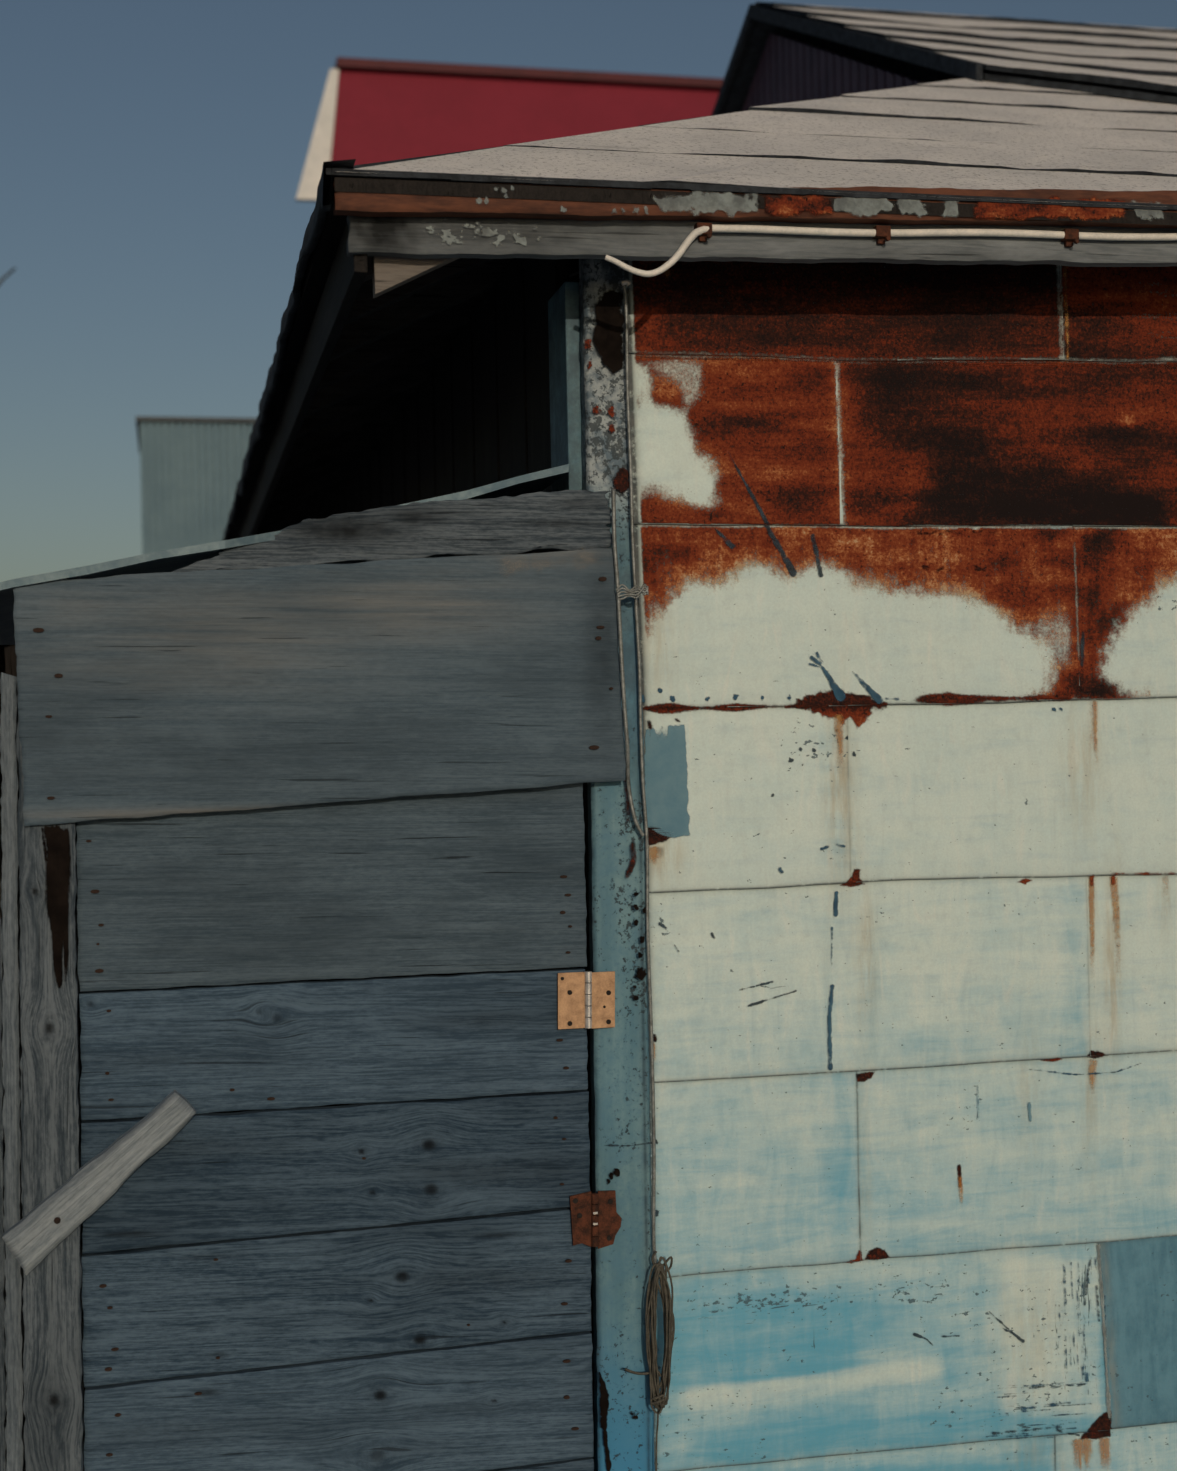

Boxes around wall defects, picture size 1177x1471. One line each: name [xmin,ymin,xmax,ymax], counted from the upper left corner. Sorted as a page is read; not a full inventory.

peeling [613,191,758,217]
peeling [833,197,958,217]
peeling [1132,201,1164,220]
peeling [593,290,625,374]
rust [613,261,1177,753]
rust [1089,872,1150,953]
rust [1074,1411,1112,1467]